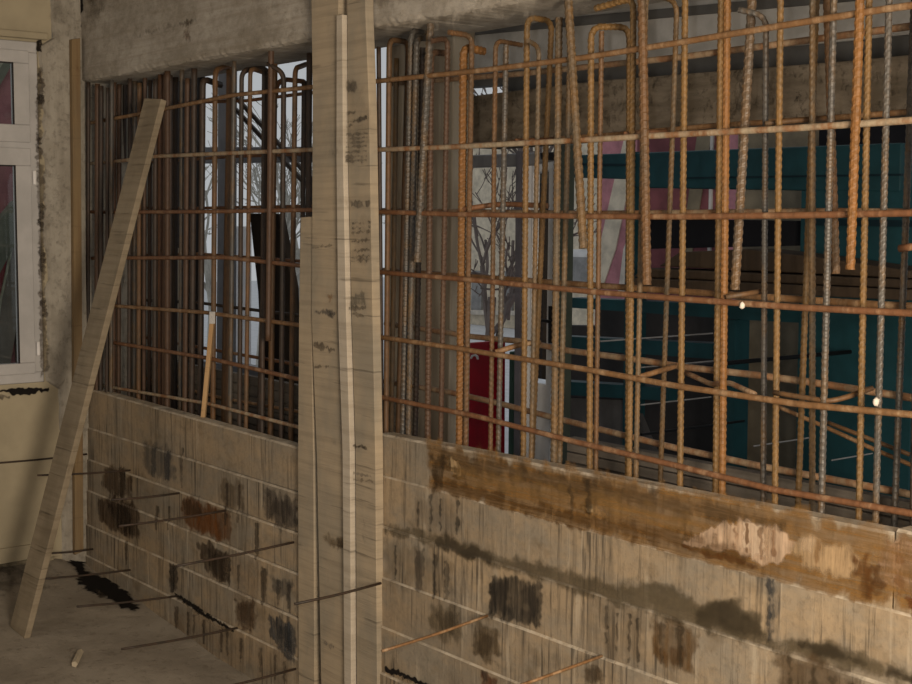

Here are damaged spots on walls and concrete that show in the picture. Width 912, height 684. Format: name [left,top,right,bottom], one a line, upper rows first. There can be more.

damp [98,465,139,564]
corrosion [181,497,231,541]
damp [197,540,240,586]
damp [255,523,291,609]
damp [266,488,298,527]
damp [385,439,912,684]
peeling [683,518,859,578]
damp [269,615,296,684]